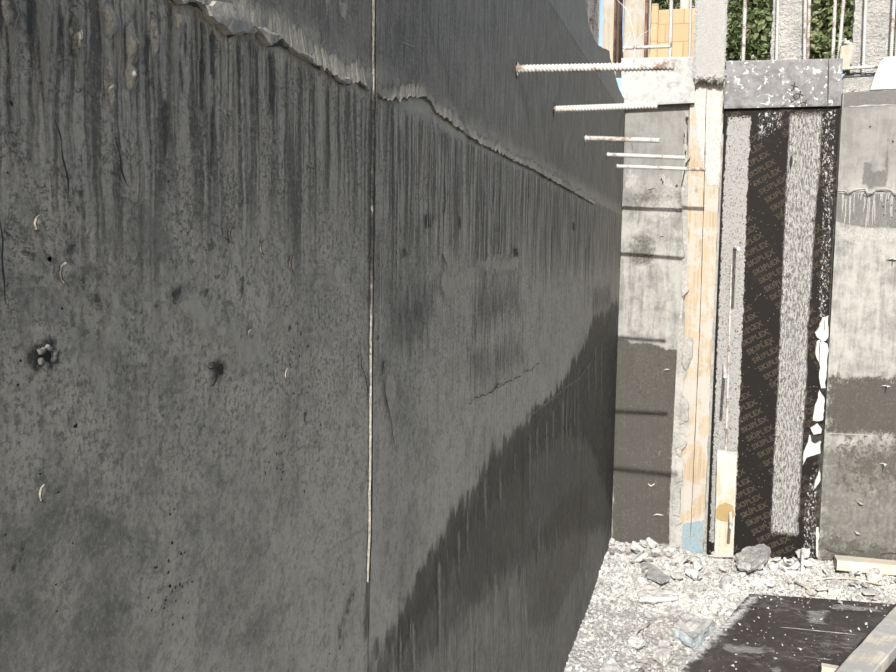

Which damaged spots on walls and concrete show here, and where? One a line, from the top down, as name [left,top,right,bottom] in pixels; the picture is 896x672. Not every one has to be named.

damp [0,0,65,112]
damp [137,3,291,171]
crack [0,222,9,306]
crack [54,119,69,201]
crack [114,135,128,186]
damp [380,113,594,353]
damp [836,151,896,243]
crack [468,363,539,404]
damp [374,288,677,672]
damp [819,375,896,561]